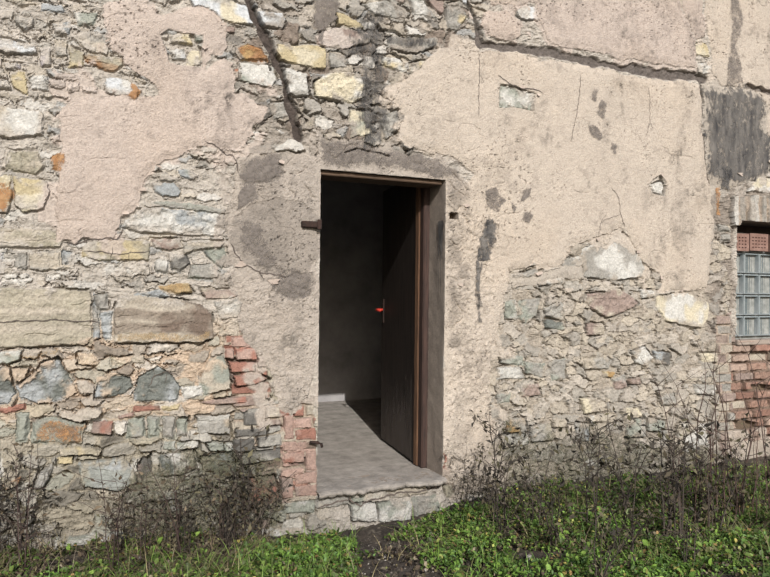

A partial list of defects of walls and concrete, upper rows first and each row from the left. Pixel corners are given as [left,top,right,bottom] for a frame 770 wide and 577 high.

spalling [167,29,208,67]
crack [466,0,710,183]
water stain [589,125,602,140]
water stain [727,0,743,87]
crack [746,83,770,95]
peeling [121,138,333,300]
water stain [237,154,284,210]
water stain [240,222,315,299]
peeling [445,180,500,369]
water stain [475,187,533,322]
spalling [510,227,714,329]
spalling [648,174,667,196]